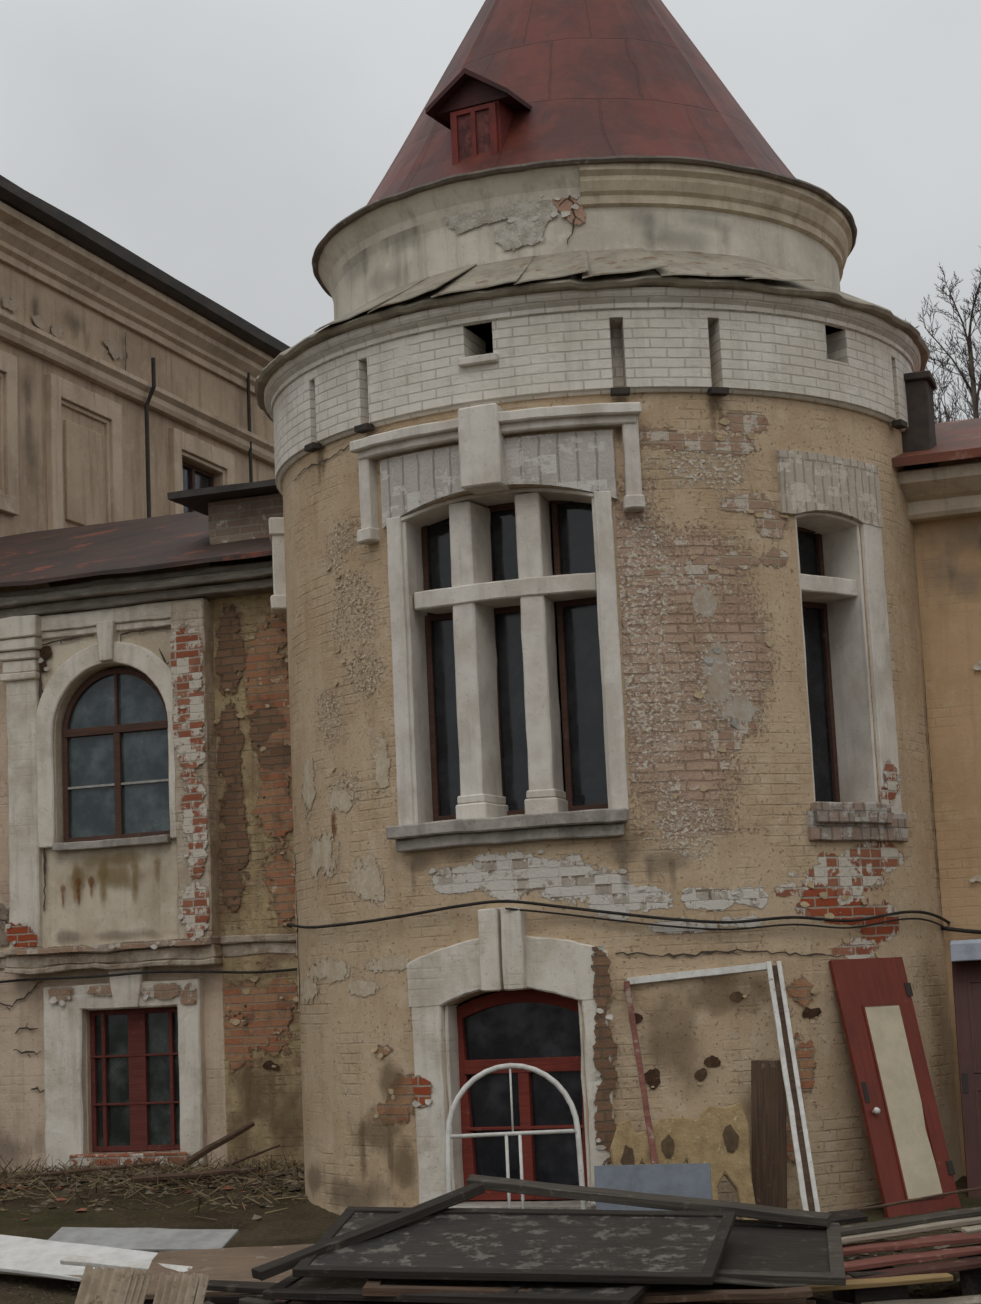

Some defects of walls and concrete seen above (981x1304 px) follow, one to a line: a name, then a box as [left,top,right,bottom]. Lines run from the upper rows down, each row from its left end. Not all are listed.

flaking render [552,195,586,226]
flaking render [614,410,795,867]
flaking render [0,511,395,955]
flaking render [881,758,902,805]
flaking render [427,841,905,959]
crack [0,981,44,1093]
flaking render [48,985,112,1006]
flaking render [139,981,197,1004]
flaking render [223,955,411,1075]
flaking render [374,1069,432,1127]
flaking render [591,945,618,1166]